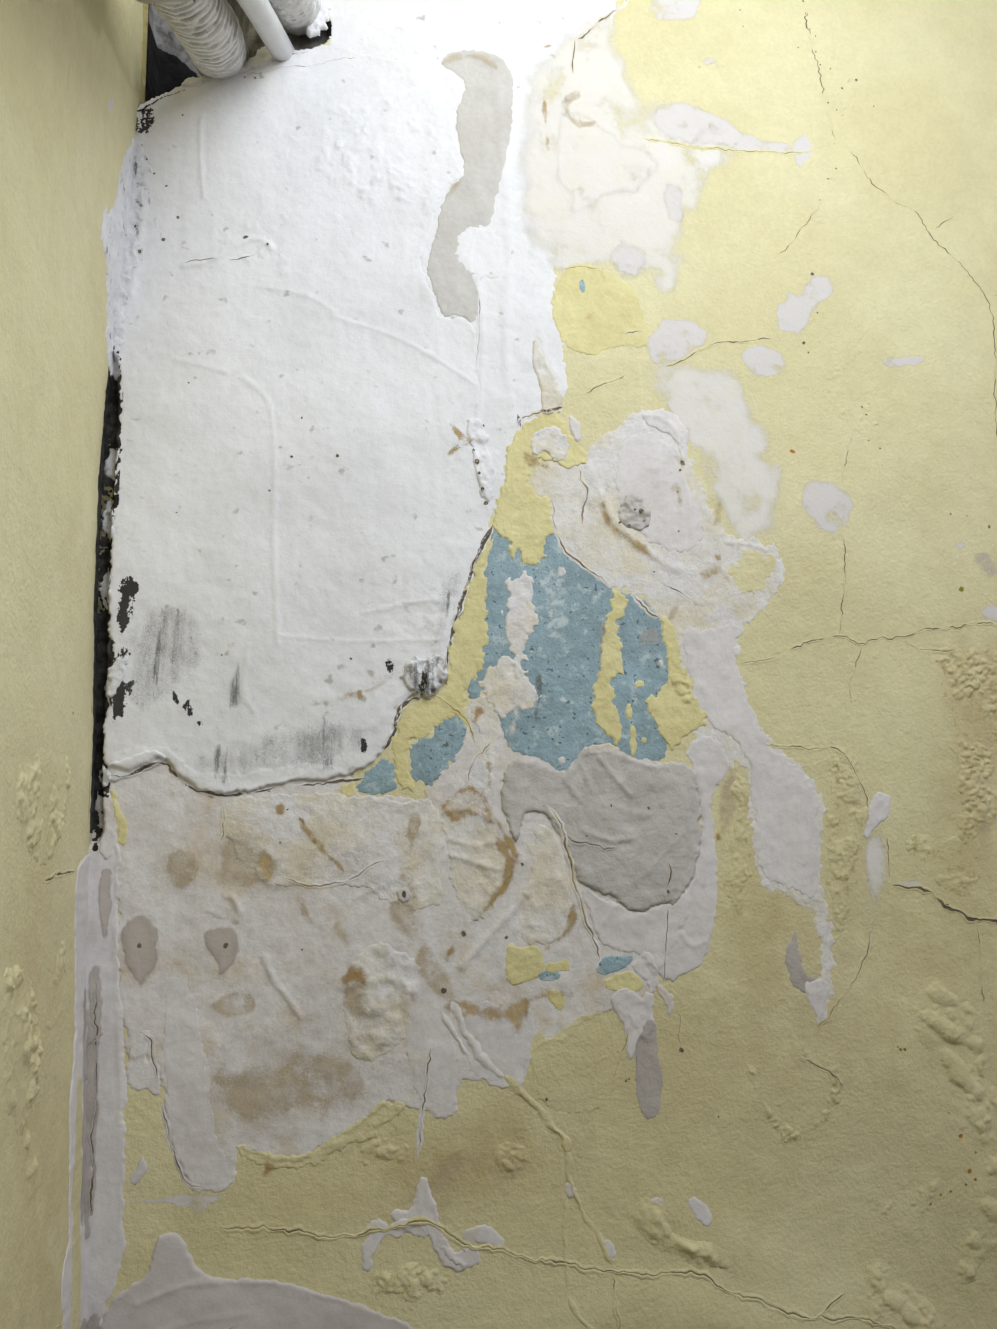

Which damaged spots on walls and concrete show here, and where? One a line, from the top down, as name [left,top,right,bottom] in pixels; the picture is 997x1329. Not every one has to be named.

spalling [136,4,201,123]
spalling [285,19,332,54]
crack [643,0,997,440]
peeling [551,264,649,356]
peeling [338,339,708,797]
crack [656,577,698,605]
crack [737,536,997,704]
peeling [93,789,128,860]
crack [766,743,997,1004]
crack [416,1047,433,1159]
peeling [505,936,654,1114]
crack [795,917,875,1087]